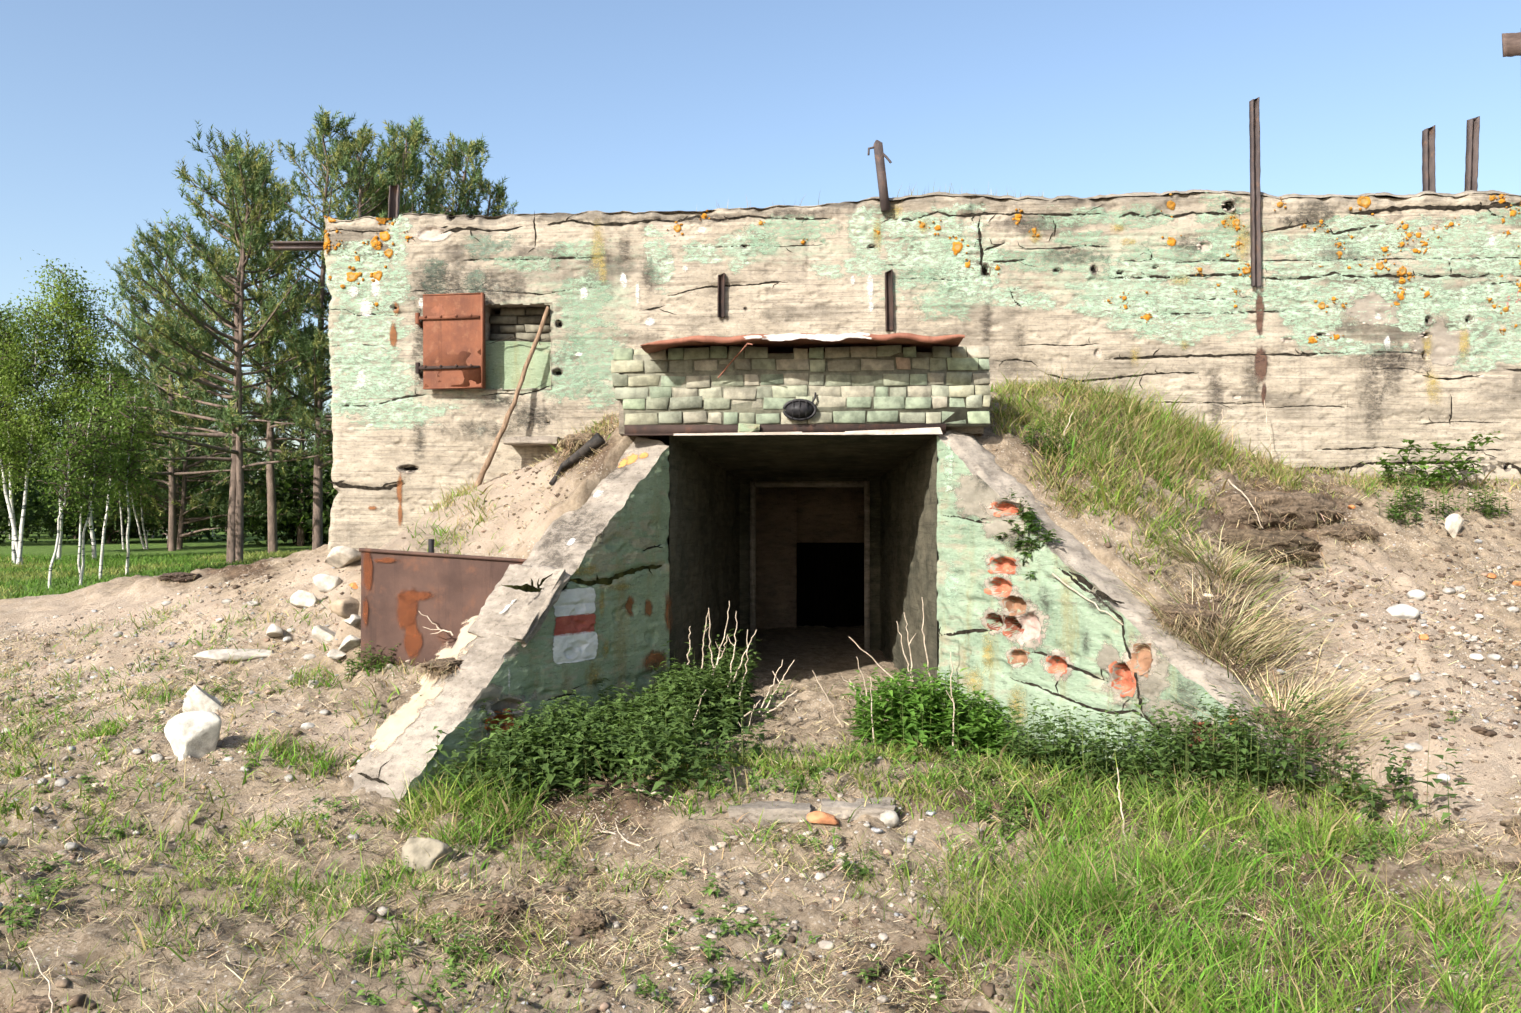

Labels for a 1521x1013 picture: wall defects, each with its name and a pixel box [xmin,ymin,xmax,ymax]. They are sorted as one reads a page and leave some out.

peeling [325,214,628,433]
peeling [642,192,1521,372]
corrosion [1255,293,1268,405]
crack [938,627,992,636]
peeling [951,474,1074,681]
crack [1010,568,1198,749]